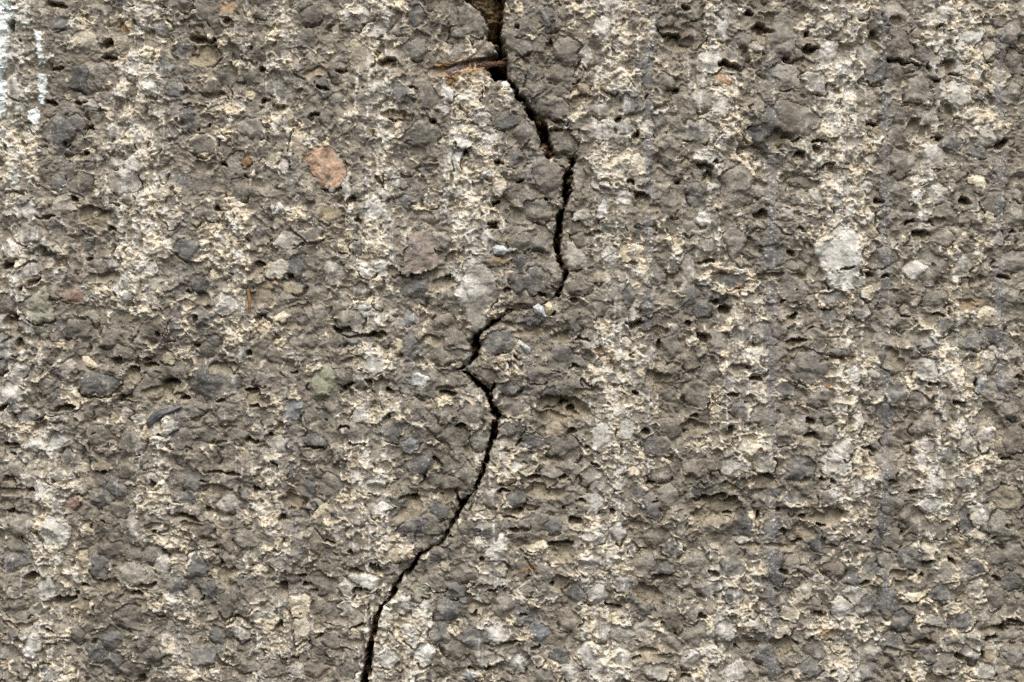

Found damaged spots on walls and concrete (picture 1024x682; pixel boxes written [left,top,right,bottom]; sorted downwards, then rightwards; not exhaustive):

crack [343,332,383,340]
crack [360,0,578,682]